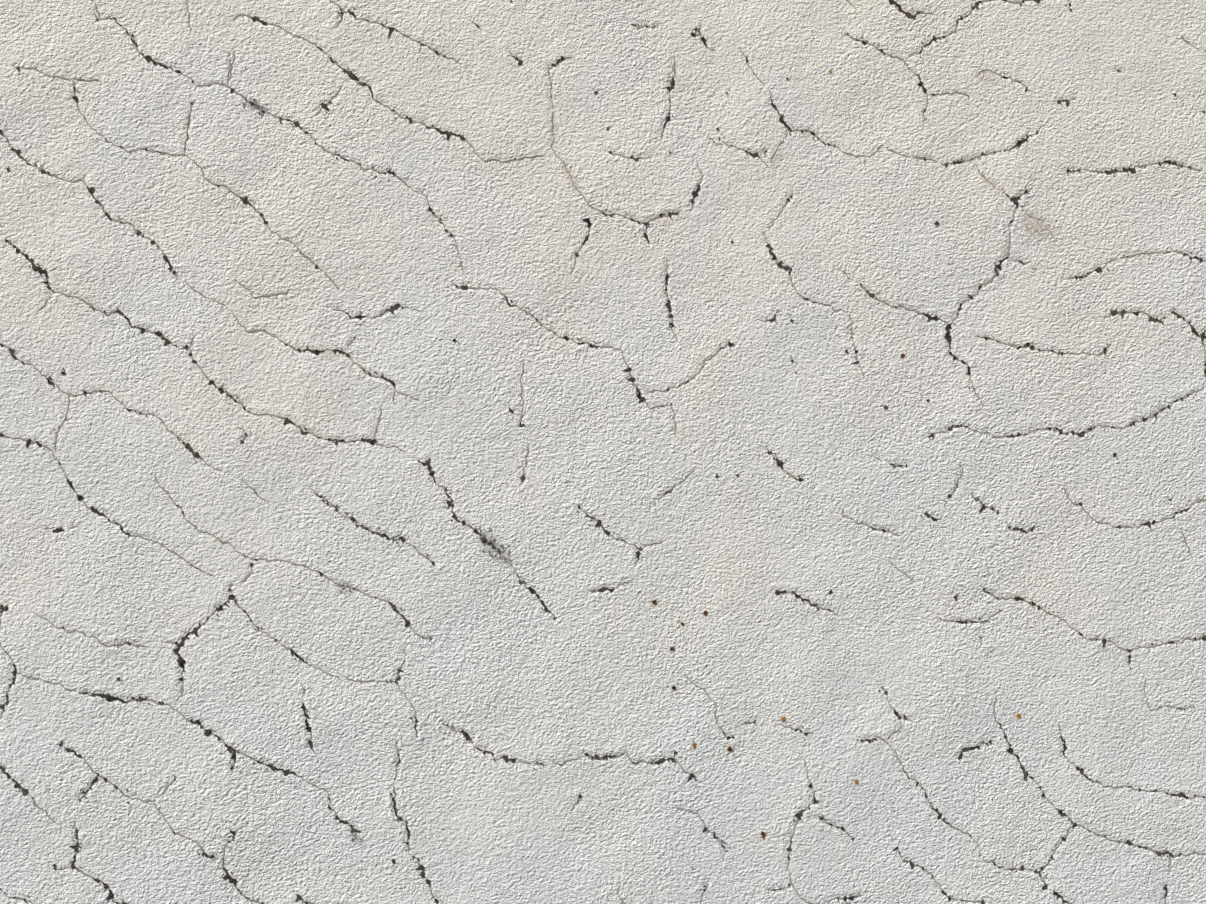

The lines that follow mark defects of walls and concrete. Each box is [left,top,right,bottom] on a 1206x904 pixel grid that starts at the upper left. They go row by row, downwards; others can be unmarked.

crack [0,0,1206,619]
crack [0,343,730,904]
crack [940,585,1206,711]
crack [682,676,861,904]
crack [856,686,1206,904]